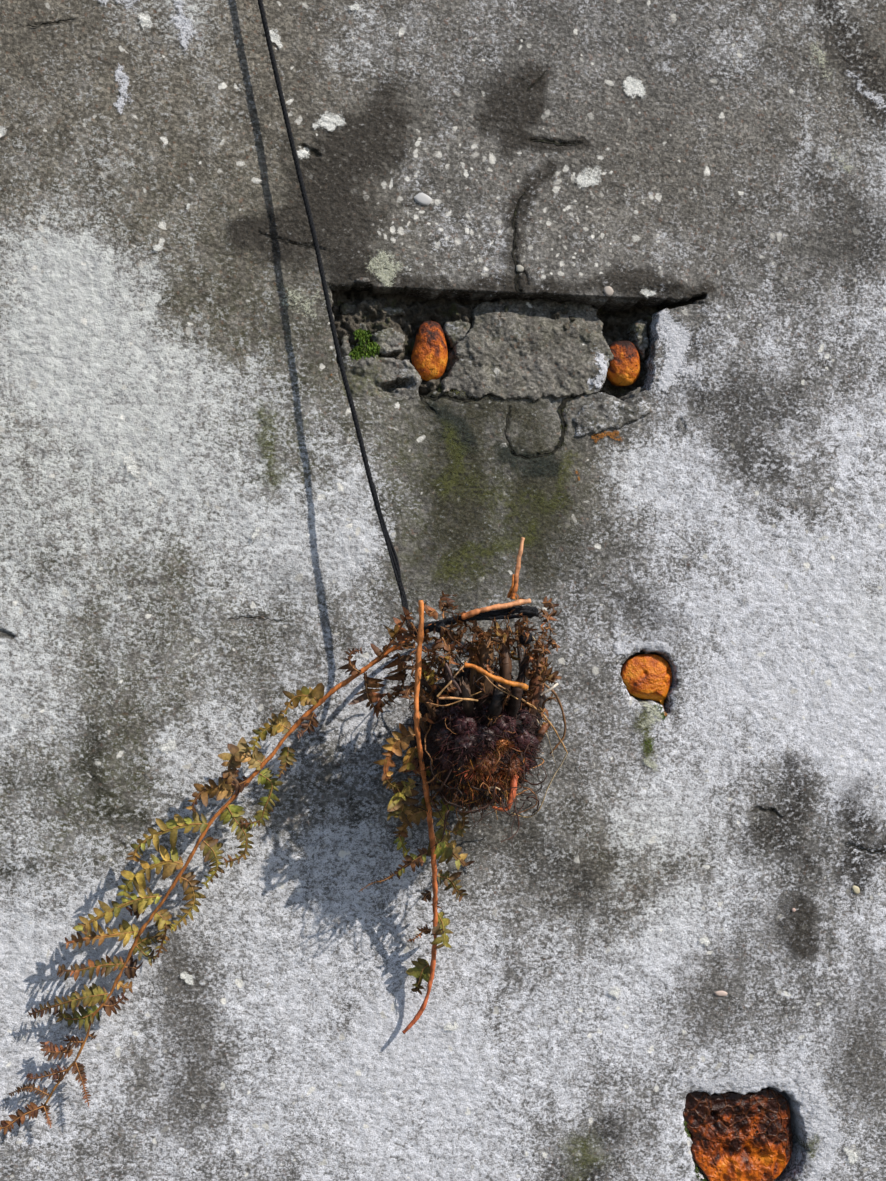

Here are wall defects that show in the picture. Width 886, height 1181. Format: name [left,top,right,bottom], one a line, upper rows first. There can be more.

crack [531,138,581,146]
damp [227,63,800,420]
crack [512,189,529,292]
corrosion [411,321,448,381]
spalling [332,278,700,437]
corrosion [606,341,640,386]
damp [738,439,787,474]
corrosion [620,654,672,716]
damp [742,756,813,866]
damp [776,895,820,960]
corrosion [683,1087,793,1181]